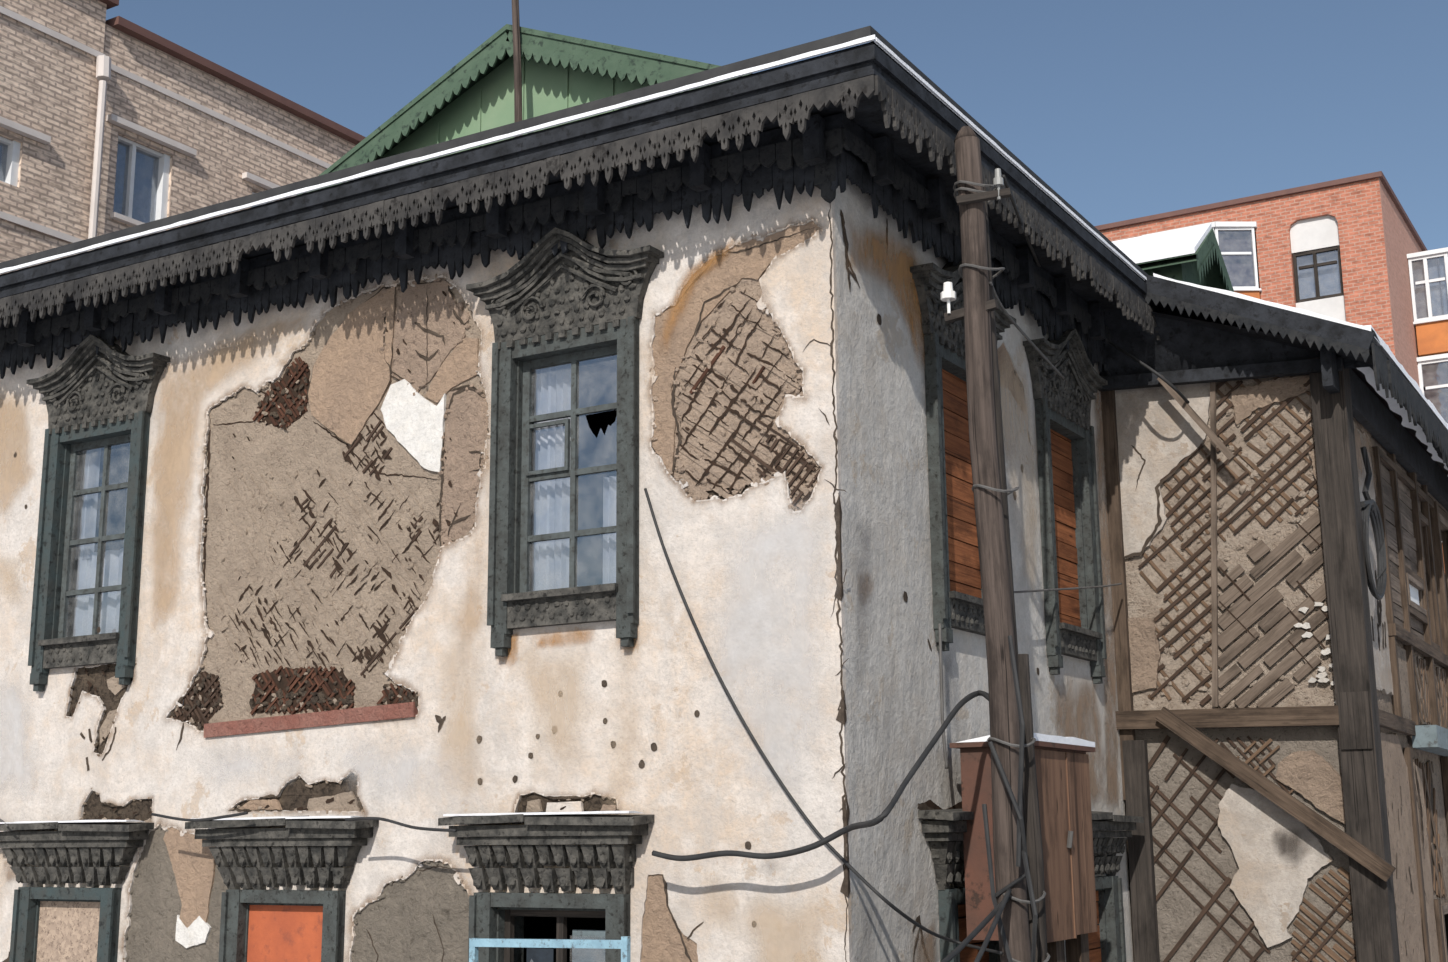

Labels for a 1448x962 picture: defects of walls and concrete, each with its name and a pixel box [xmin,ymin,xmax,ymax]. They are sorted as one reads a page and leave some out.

peeling [649,219,822,511]
peeling [168,274,490,738]
crack [803,205,860,962]
flaking render [834,493,844,601]
peeling [1294,602,1336,703]
flaking render [836,690,847,726]
peeling [65,663,228,962]
flaking render [229,772,367,815]
flaking render [840,793,850,898]
peeling [350,859,471,962]
peeling [641,874,703,962]